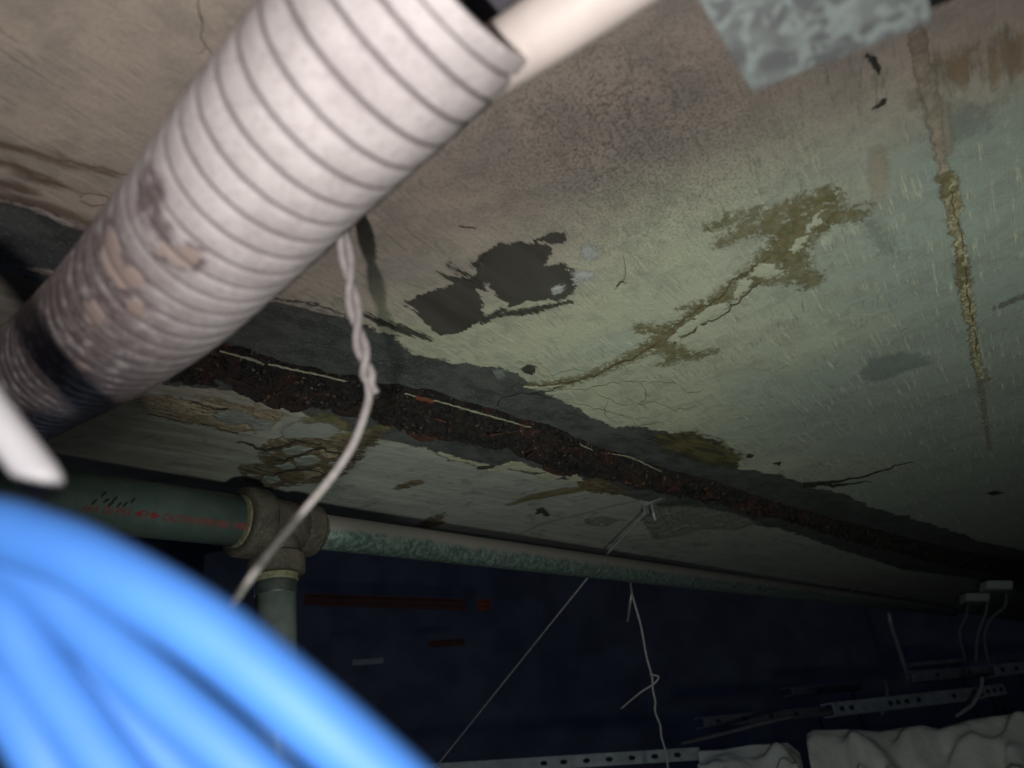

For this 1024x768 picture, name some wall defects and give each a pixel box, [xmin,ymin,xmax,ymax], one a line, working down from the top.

peeling [0,202,85,284]
efflorescence [550,243,602,295]
crack [908,26,992,450]
peeling [135,378,1024,592]
corrosion [170,343,1024,579]
peeling [222,232,1024,561]
crack [803,462,914,488]